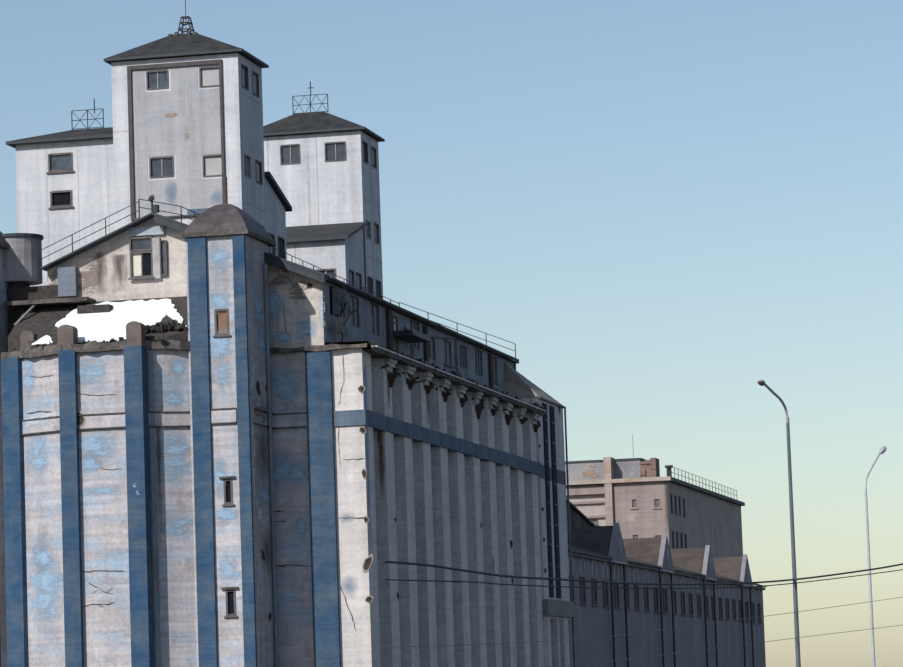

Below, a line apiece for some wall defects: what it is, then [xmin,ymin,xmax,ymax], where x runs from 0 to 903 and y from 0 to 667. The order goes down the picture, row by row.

crack [82,570,125,607]